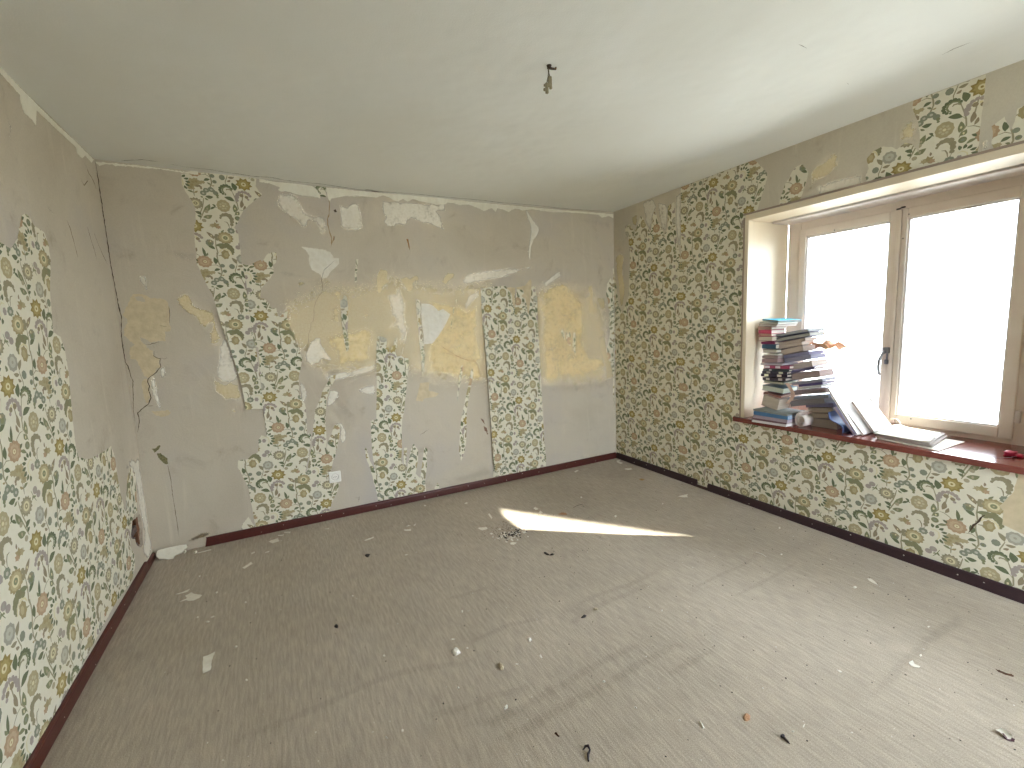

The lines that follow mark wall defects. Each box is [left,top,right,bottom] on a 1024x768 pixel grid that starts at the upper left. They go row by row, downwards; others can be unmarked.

crack [68,162,170,429]
peeling [421,303,450,344]